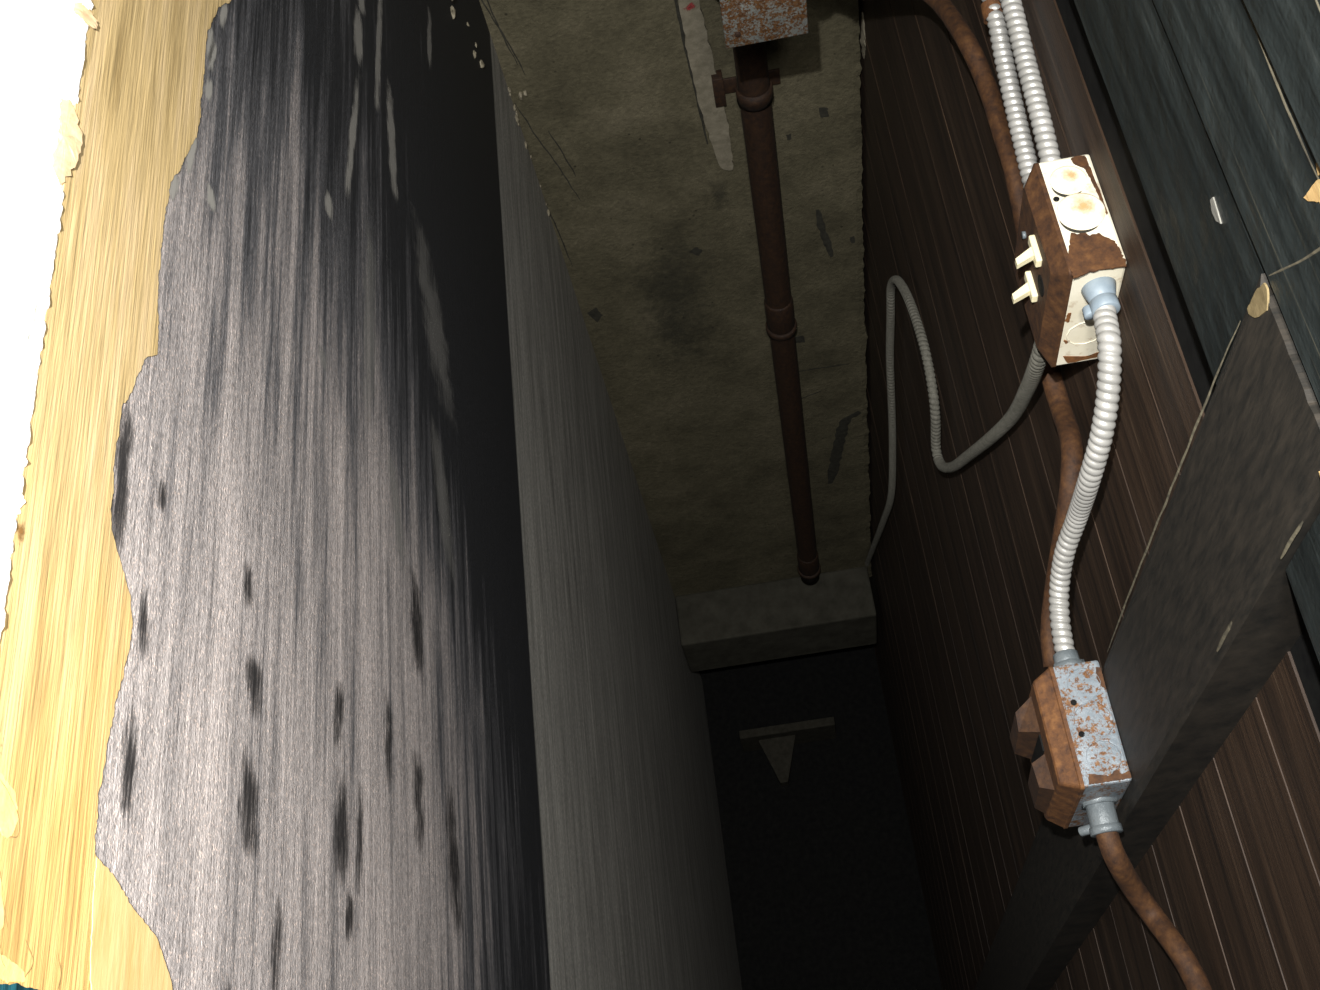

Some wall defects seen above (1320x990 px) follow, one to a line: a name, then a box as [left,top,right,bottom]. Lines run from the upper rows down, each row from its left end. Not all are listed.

peeling [73,2,98,29]
peeling [52,93,83,185]
peeling [0,772,20,839]
peeling [90,858,172,990]
peeling [0,941,33,983]